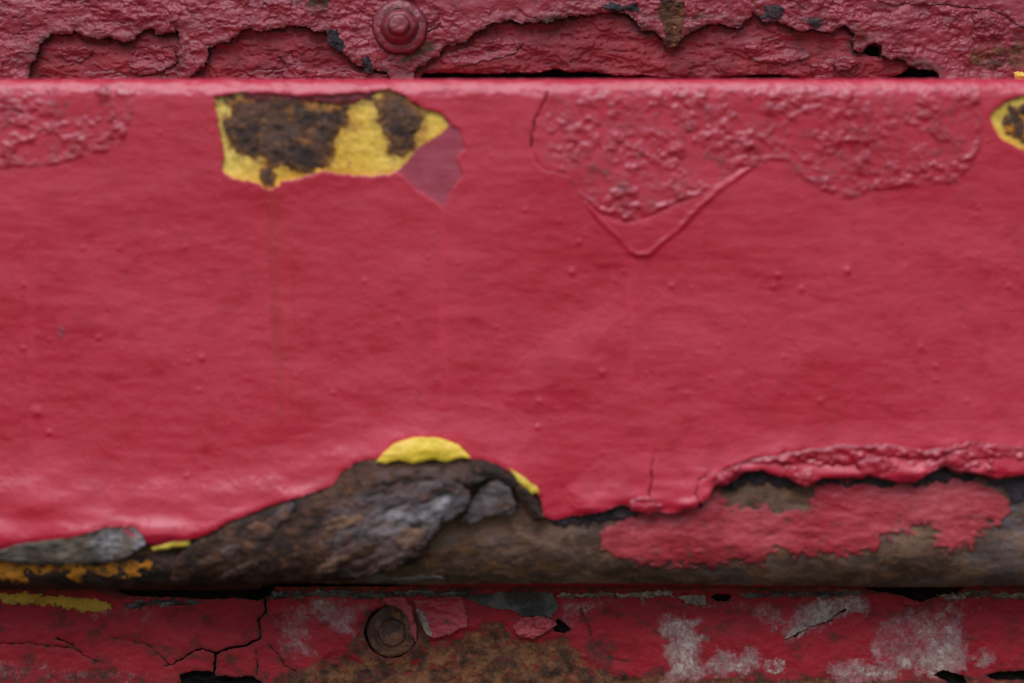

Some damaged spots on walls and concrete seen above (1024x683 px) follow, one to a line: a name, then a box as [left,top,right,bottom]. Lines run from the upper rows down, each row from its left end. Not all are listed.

peeling [29,28,181,79]
peeling [414,1,914,79]
peeling [879,0,1024,41]
peeling [191,25,465,207]
peeling [713,441,1024,487]
rust [0,437,1024,591]
crack [134,590,296,678]
peeling [381,589,707,643]
rust [287,610,941,683]
leakage [659,614,784,683]
leakage [772,590,869,640]
leakage [827,621,996,683]